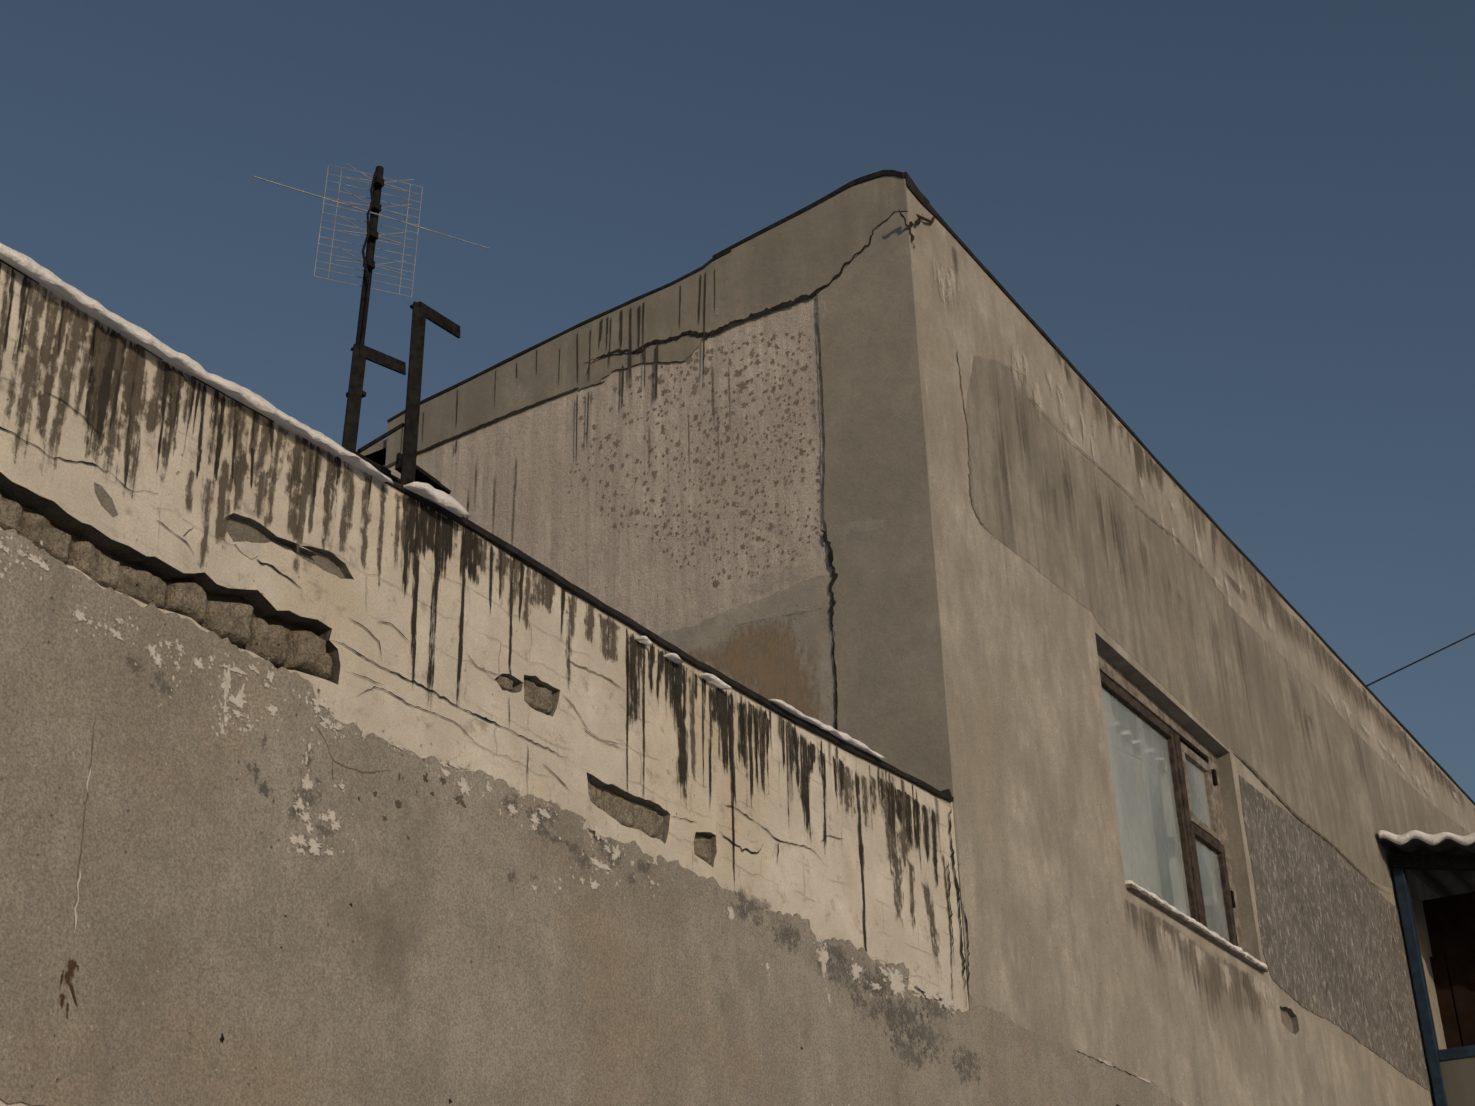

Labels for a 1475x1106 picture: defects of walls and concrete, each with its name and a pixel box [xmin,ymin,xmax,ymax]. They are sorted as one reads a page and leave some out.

corrosion [60,960,79,1019]
crack [73,717,96,944]
spalling [0,472,670,902]
damp [0,262,953,987]
crack [387,209,920,730]
damp [1012,351,1460,799]